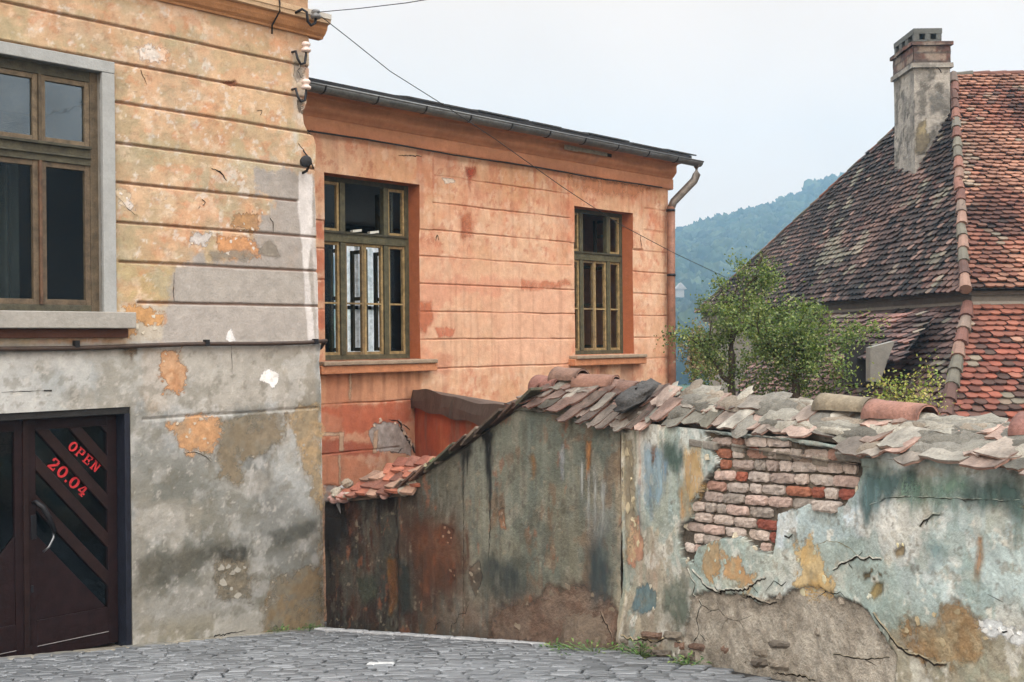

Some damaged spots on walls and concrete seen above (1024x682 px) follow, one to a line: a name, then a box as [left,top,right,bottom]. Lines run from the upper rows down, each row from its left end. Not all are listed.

flaking render [189,211,263,260]
peeling [122,304,164,338]
peeling [159,347,188,396]
flaking render [369,418,413,456]
flaking render [166,403,337,632]
damp [860,469,916,523]
crack [871,496,1020,527]
damp [964,477,1023,513]
damp [140,545,245,583]
flaking render [489,432,897,682]
crack [817,540,947,666]
flaking render [900,599,1024,671]